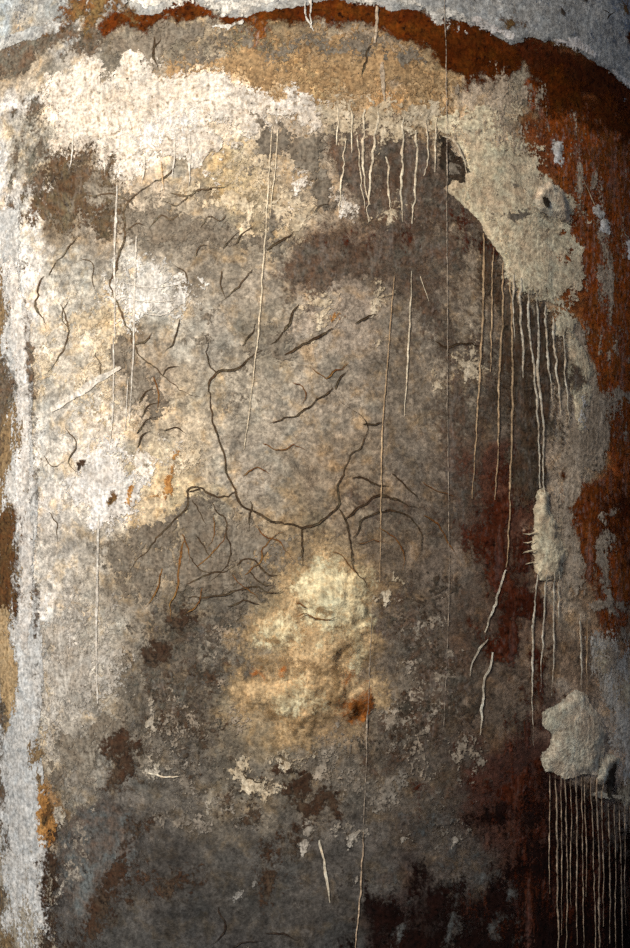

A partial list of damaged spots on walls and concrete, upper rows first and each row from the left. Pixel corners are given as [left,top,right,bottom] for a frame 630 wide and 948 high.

crack [34,165,455,621]
damp [0,0,574,567]
rust [42,0,630,645]
damp [0,594,276,948]
rust [140,602,203,668]
damp [295,570,630,948]
rust [453,453,566,851]